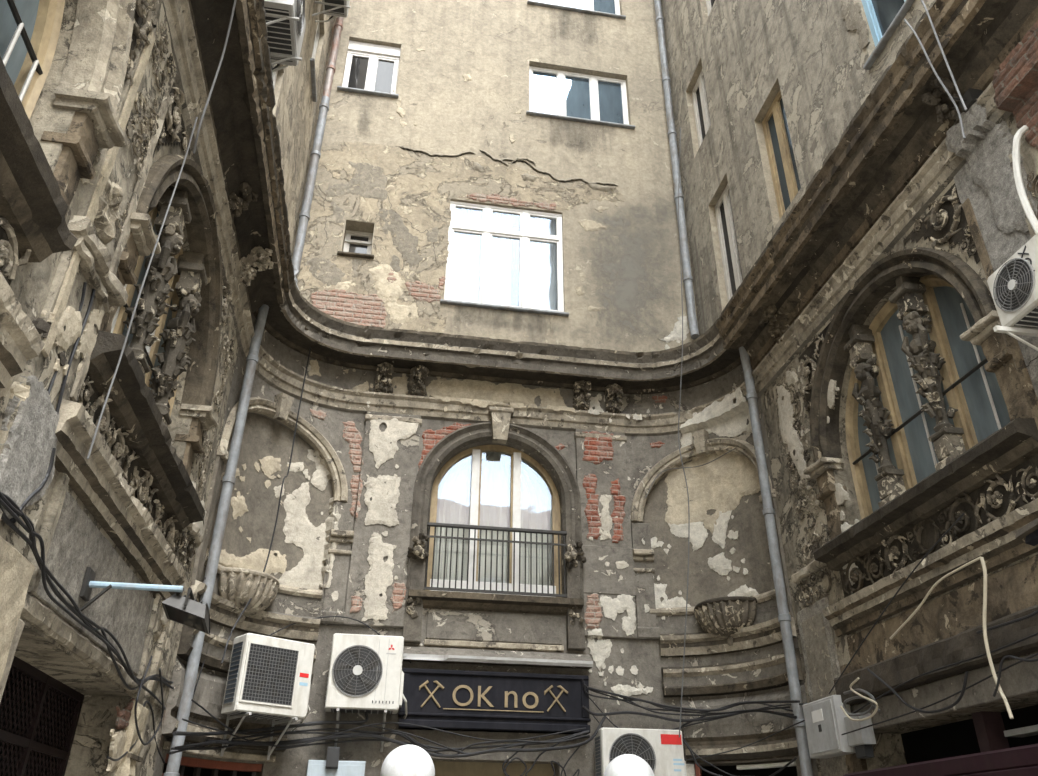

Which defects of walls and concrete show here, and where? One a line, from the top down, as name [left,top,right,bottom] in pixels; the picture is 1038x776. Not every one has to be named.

crack [399,146,618,186]
peeling [945,20,1038,234]
peeling [296,141,624,333]
peeling [308,359,321,376]
peeling [182,381,471,630]
peeling [391,373,410,395]
peeling [426,376,626,543]
flaking render [626,395,667,420]
peeling [641,387,761,597]
peeling [605,561,629,580]
peeling [584,575,692,699]